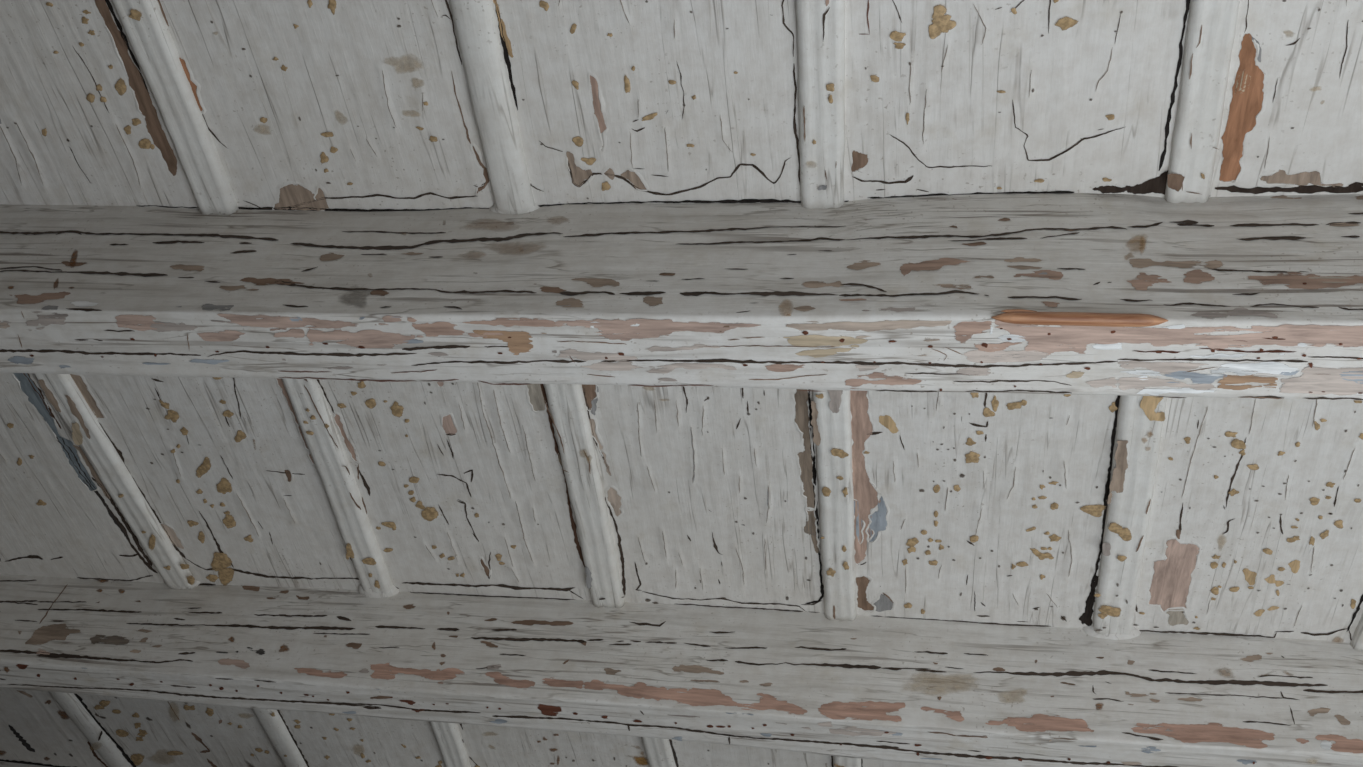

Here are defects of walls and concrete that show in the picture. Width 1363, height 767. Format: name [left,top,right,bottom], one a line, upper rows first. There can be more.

peeling [92,0,181,183]
crack [532,20,806,196]
crack [1012,70,1124,161]
crack [1096,13,1121,89]
peeling [1215,28,1363,200]
peeling [115,277,761,518]
crack [0,175,1363,767]
peeling [791,372,922,613]
peeling [765,257,1363,421]
peeling [1145,530,1202,627]
peeling [485,664,964,737]
peeling [1121,723,1275,765]